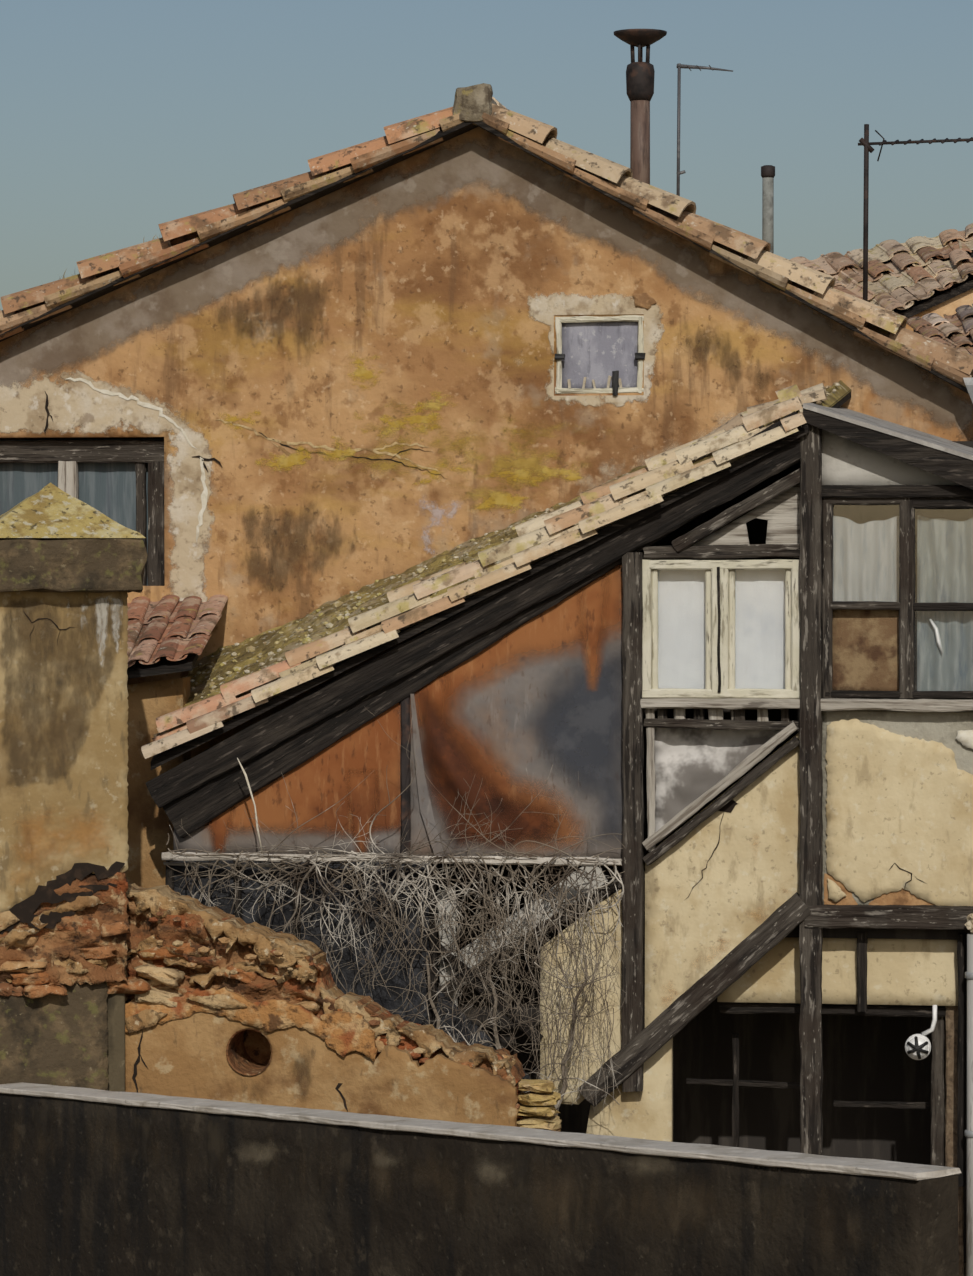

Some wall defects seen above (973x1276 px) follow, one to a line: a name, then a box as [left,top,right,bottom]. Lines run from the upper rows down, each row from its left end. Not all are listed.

flaking render [528,292,665,407]
crack [193,455,223,473]
crack [218,419,445,479]
corrosion [207,564,623,853]
flaking render [827,712,973,775]
crack [686,813,724,899]
flaking render [824,873,935,905]
flaking render [0,895,107,951]
flaking render [54,958,108,974]
flaking render [125,987,378,1062]